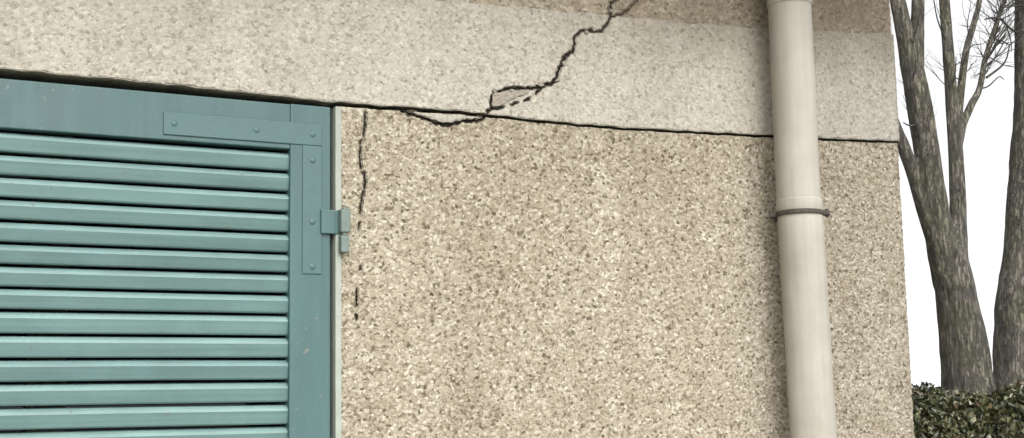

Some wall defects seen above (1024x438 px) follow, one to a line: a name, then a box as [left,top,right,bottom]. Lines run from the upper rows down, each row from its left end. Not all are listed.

spalling [491,89,529,107]
crack [392,0,638,126]
crack [358,113,367,229]